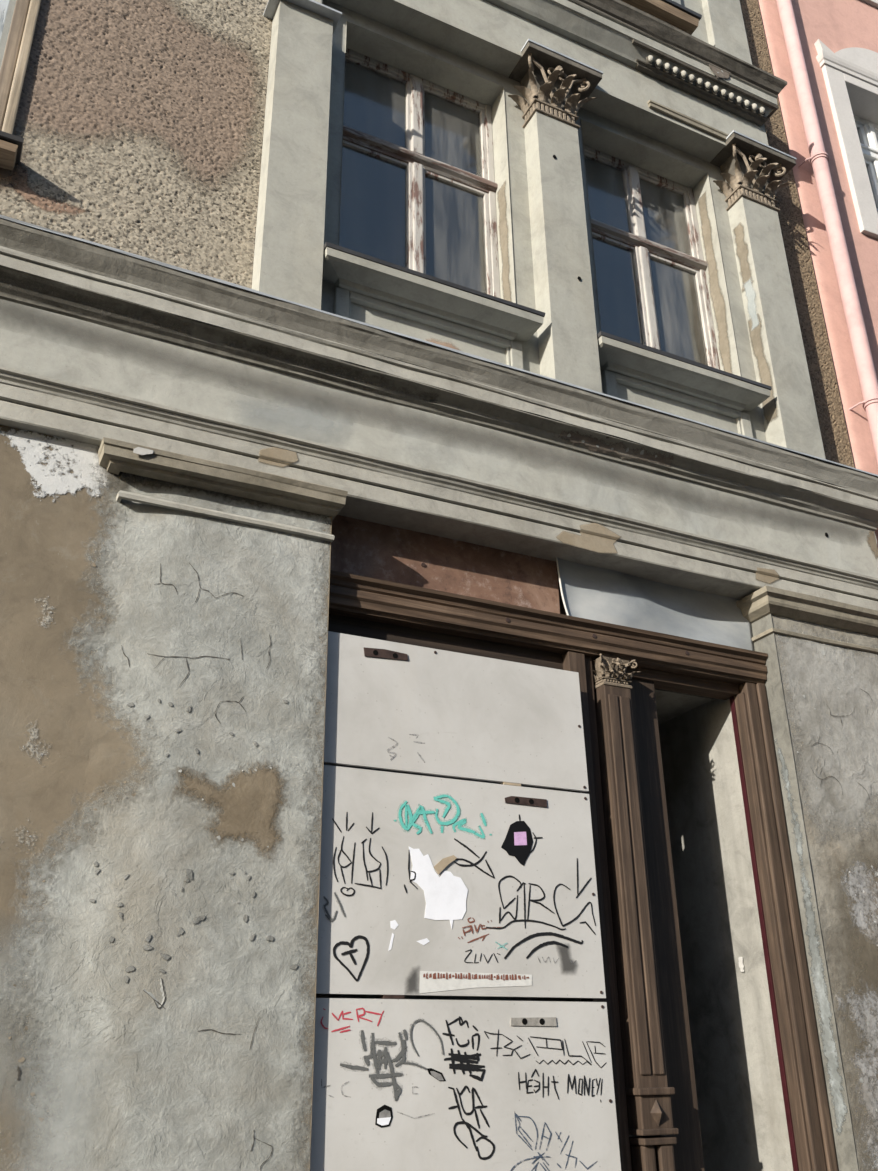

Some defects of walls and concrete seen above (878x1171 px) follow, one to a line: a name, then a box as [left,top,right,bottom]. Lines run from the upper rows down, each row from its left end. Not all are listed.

peeling [734,224,753,292]
peeling [748,315,777,423]
crack [154,563,243,602]
crack [121,635,271,685]
peeling [0,427,331,1171]